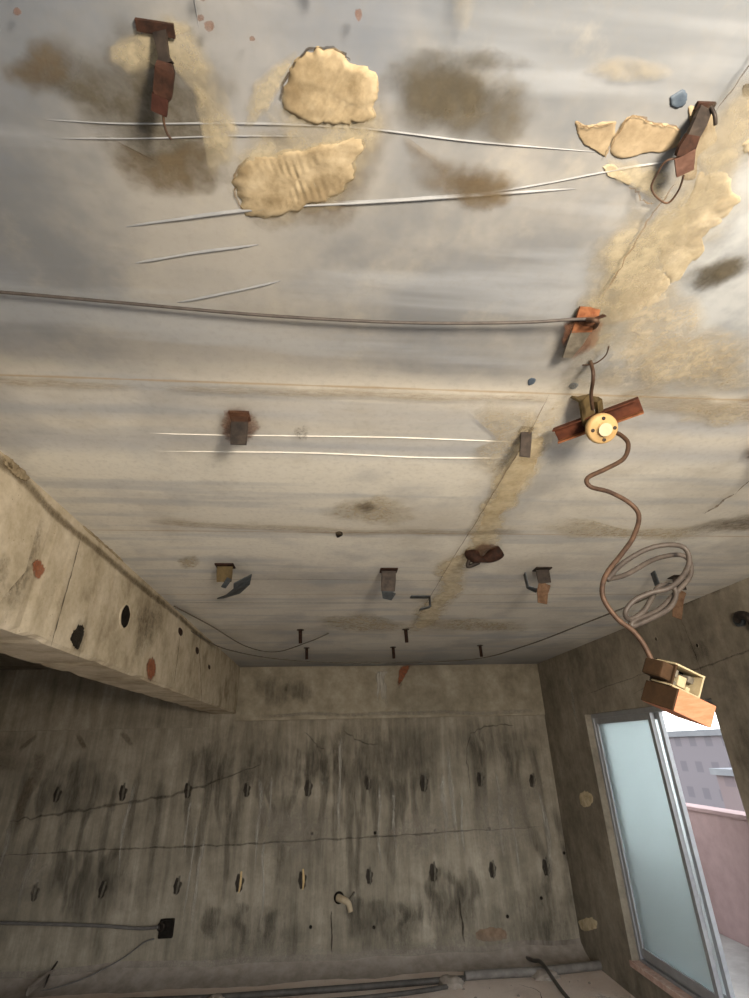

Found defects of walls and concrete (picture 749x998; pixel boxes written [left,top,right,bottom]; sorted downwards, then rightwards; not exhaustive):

peeling [118,32,204,73]
damp [23,49,206,188]
spalling [231,46,379,219]
damp [409,74,519,139]
crack [716,65,749,111]
peeling [575,84,749,347]
corrosion [564,316,602,355]